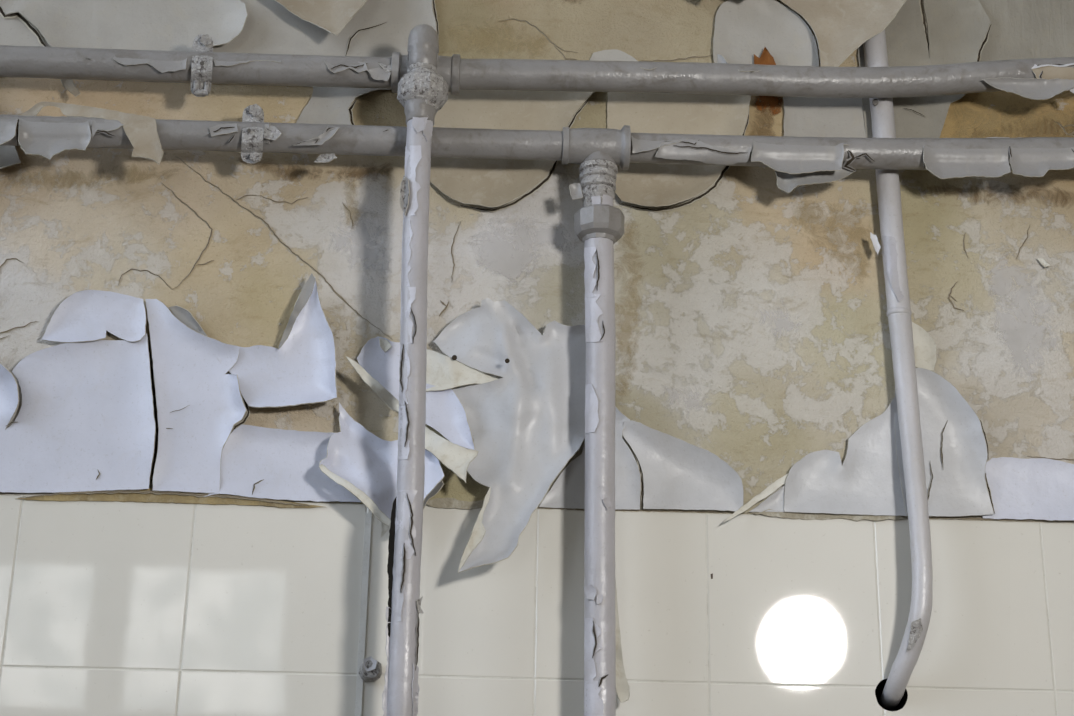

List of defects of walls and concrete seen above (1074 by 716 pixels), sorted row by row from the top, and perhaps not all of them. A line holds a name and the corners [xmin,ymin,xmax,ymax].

peeling [0,0,439,163]
crack [207,126,235,144]
peeling [590,49,637,61]
peeling [607,92,1074,212]
peeling [713,0,992,67]
peeling [982,63,1074,100]
crack [118,184,214,290]
crack [177,157,461,447]
peeling [0,90,604,716]
peeling [602,393,908,523]
peeling [912,322,1074,521]